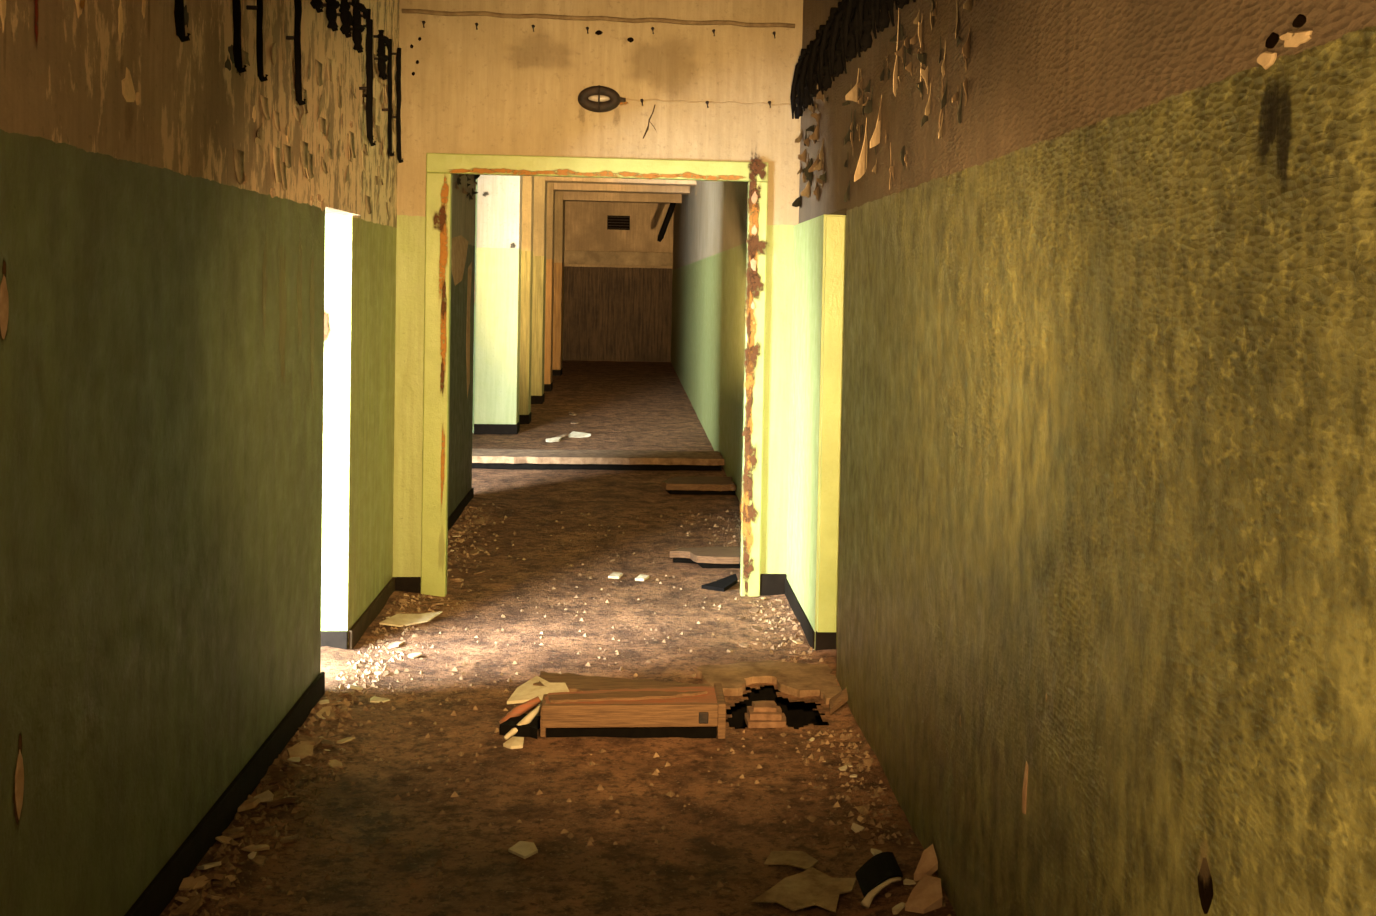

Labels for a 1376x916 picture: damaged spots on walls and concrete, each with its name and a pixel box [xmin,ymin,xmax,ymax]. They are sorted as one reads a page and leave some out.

spalling [122,67,141,105]
peeling [233,37,421,221]
peeling [792,0,976,208]
peeling [0,259,9,341]
corrosion [433,153,767,596]
peeling [13,733,24,826]